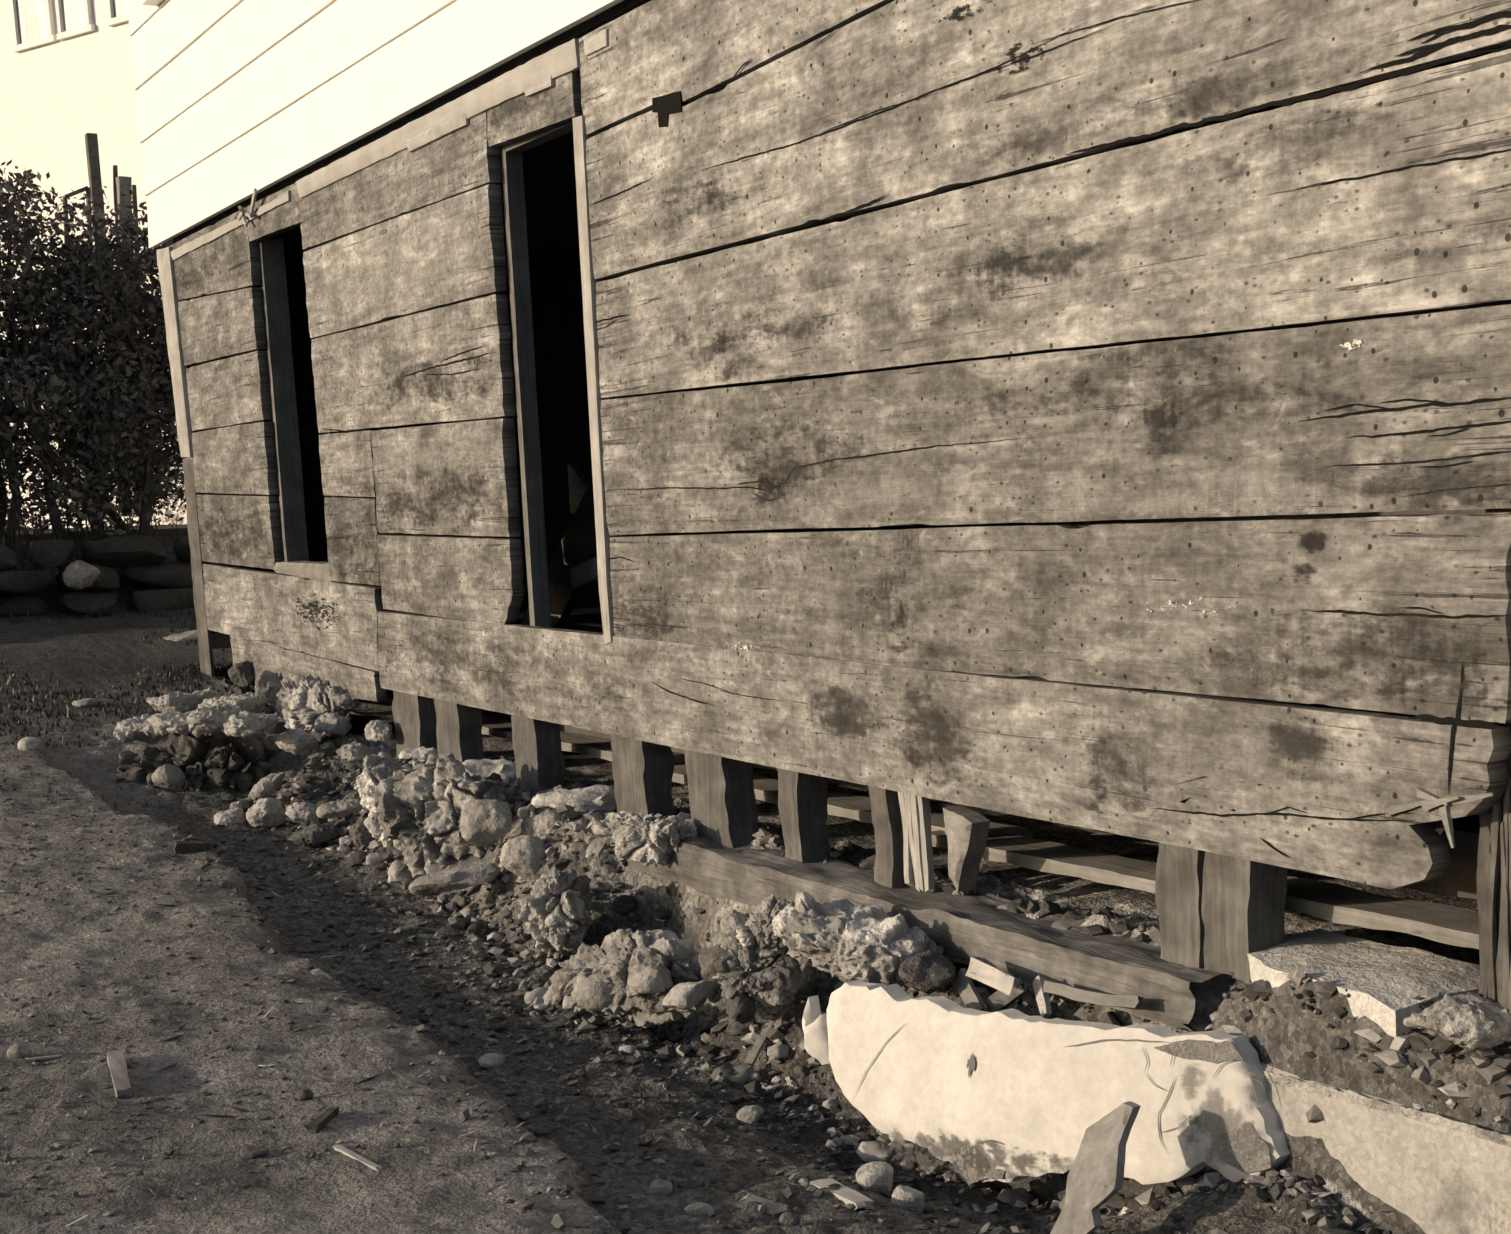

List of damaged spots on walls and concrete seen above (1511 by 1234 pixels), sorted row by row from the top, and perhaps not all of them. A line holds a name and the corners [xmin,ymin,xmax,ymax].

crack [1065,11,1511,155]
crack [818,194,887,222]
damp [1143,348,1262,454]
crack [1301,397,1511,497]
damp [813,689,878,737]
damp [894,685,969,784]
crack [1152,807,1416,858]